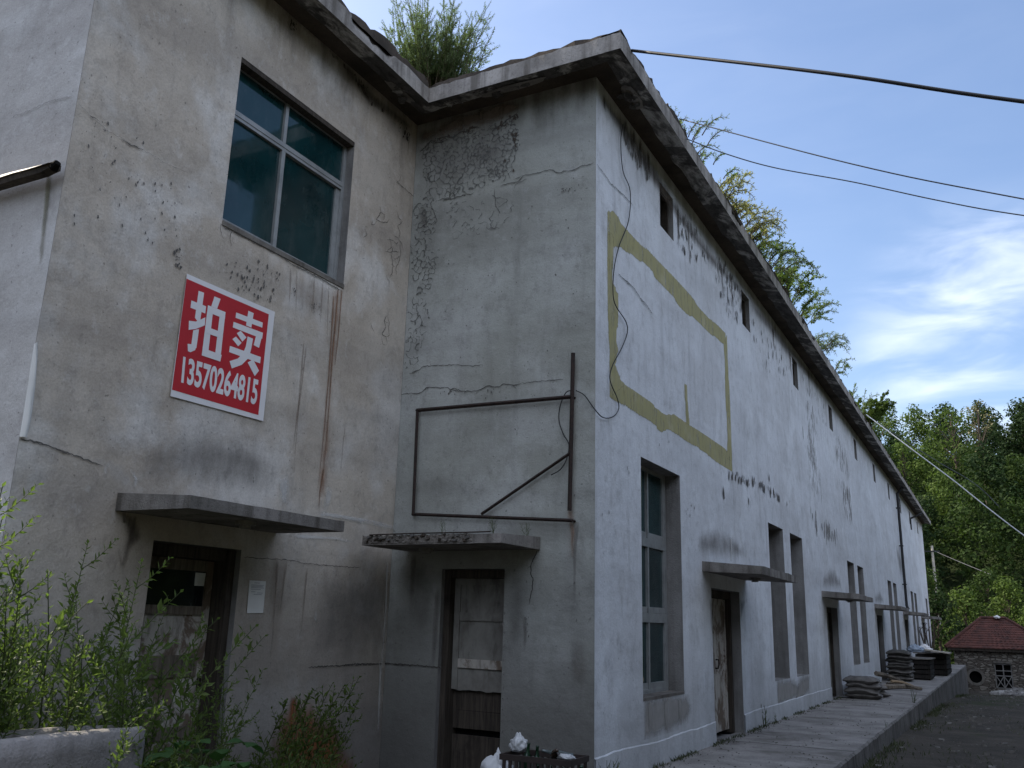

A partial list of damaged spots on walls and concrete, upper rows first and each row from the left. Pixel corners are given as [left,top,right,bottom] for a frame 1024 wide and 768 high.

crack [364,116,632,395]
damp [604,100,733,300]
rust [322,291,342,451]
crack [21,439,103,466]
spalling [362,531,491,544]